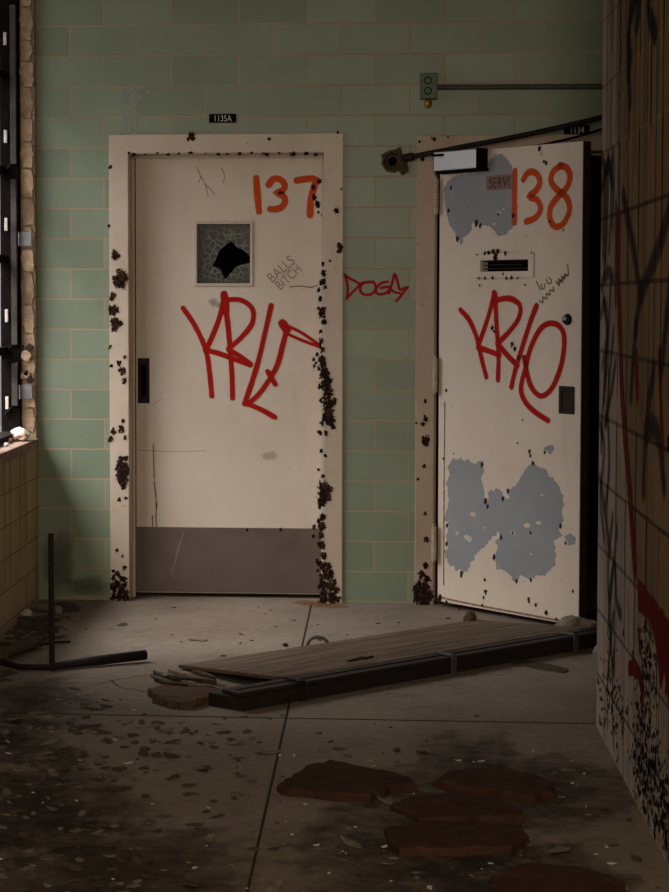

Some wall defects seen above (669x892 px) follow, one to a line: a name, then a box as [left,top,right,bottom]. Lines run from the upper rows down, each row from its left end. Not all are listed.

peeling [443,153,515,245]
rust [108,248,129,332]
rust [109,355,127,384]
rust [312,338,337,436]
rust [108,419,126,443]
rust [109,547,130,601]
rust [114,455,130,502]
rust [298,474,342,607]
peeling [444,449,576,583]
damp [597,311,669,859]
damp [304,808,524,892]